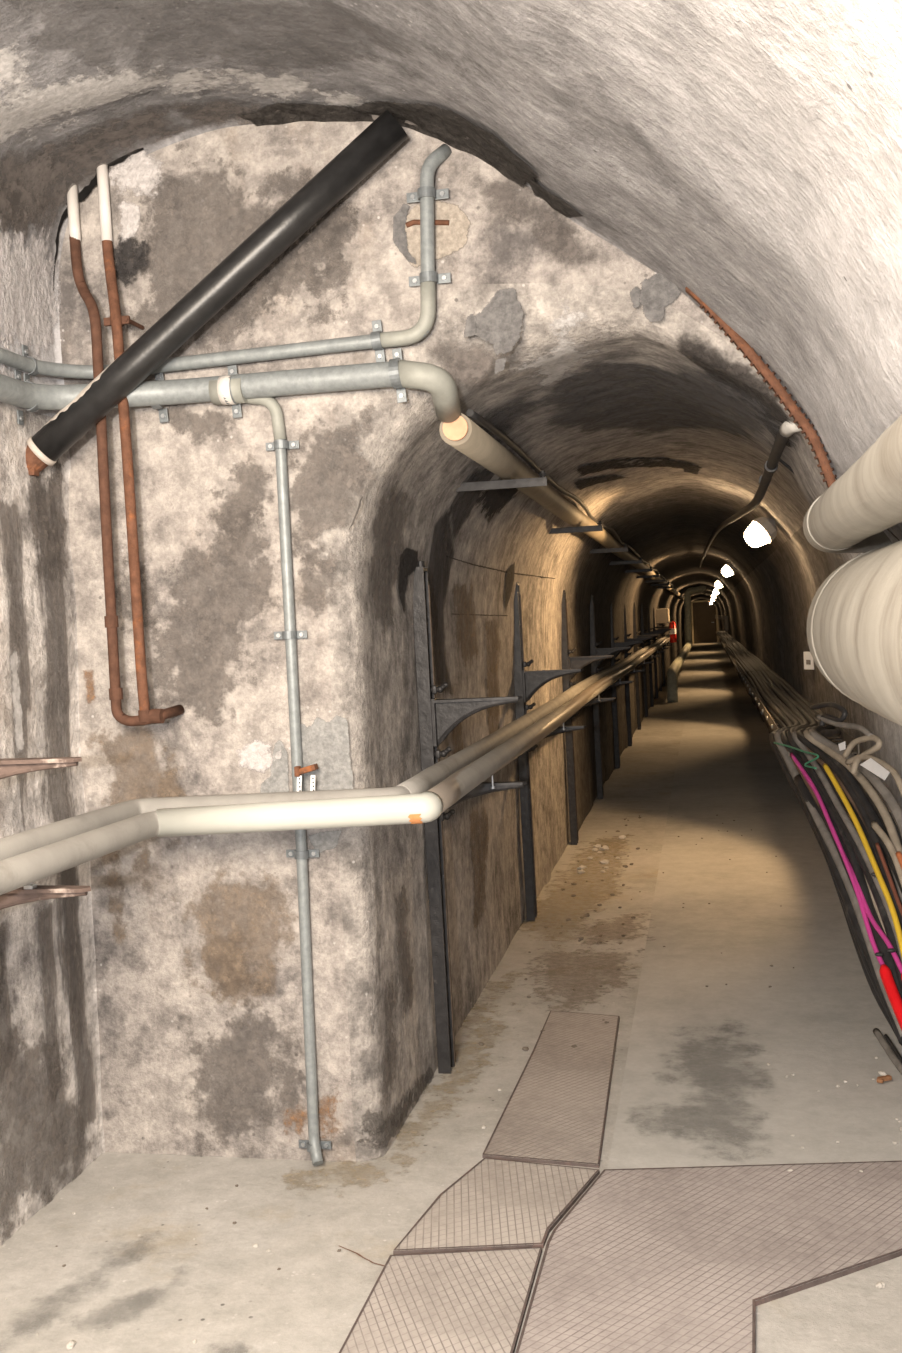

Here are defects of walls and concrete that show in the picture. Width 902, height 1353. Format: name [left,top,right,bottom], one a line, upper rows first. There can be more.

damp [0,459,74,830]
damp [115,465,275,727]
damp [186,873,306,1157]
corrosion [284,1096,338,1138]